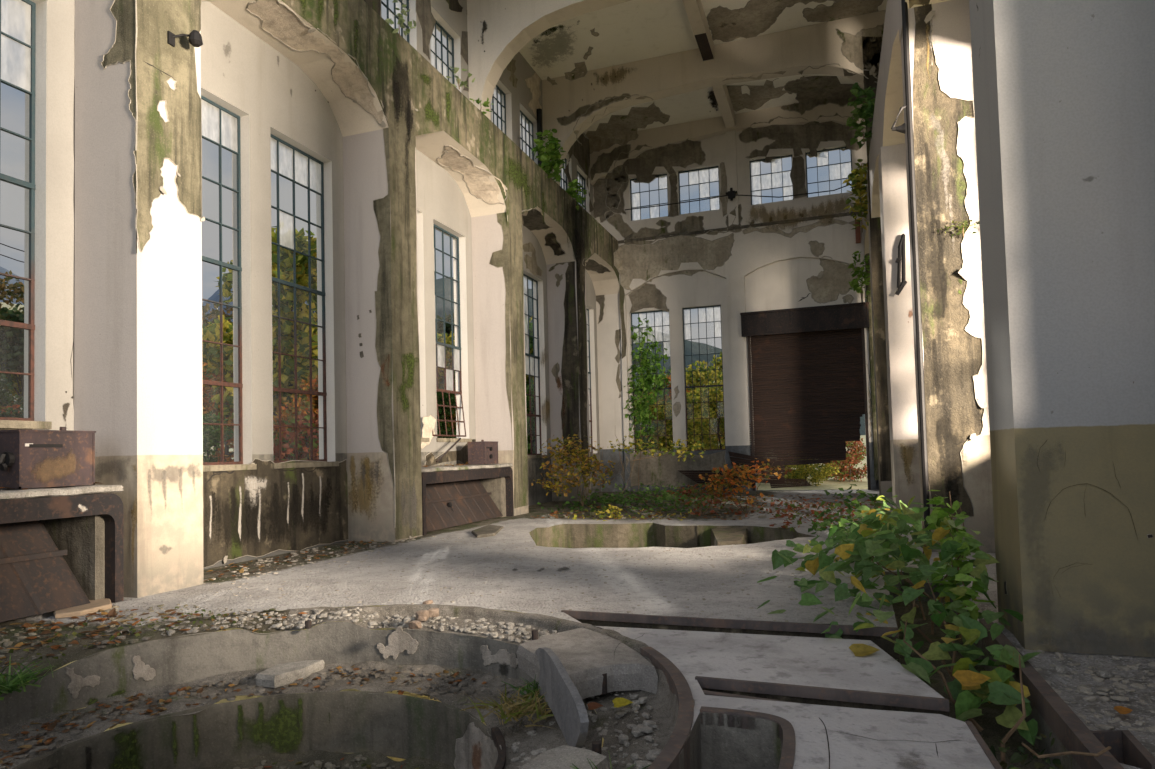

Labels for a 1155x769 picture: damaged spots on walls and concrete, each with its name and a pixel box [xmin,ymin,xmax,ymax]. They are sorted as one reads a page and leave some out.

peeling [100,0,205,253]
peeling [246,0,476,540]
peeling [436,0,892,508]
peeling [909,0,987,519]
rust [33,453,76,482]
damp [209,473,332,546]
crack [819,718,876,769]